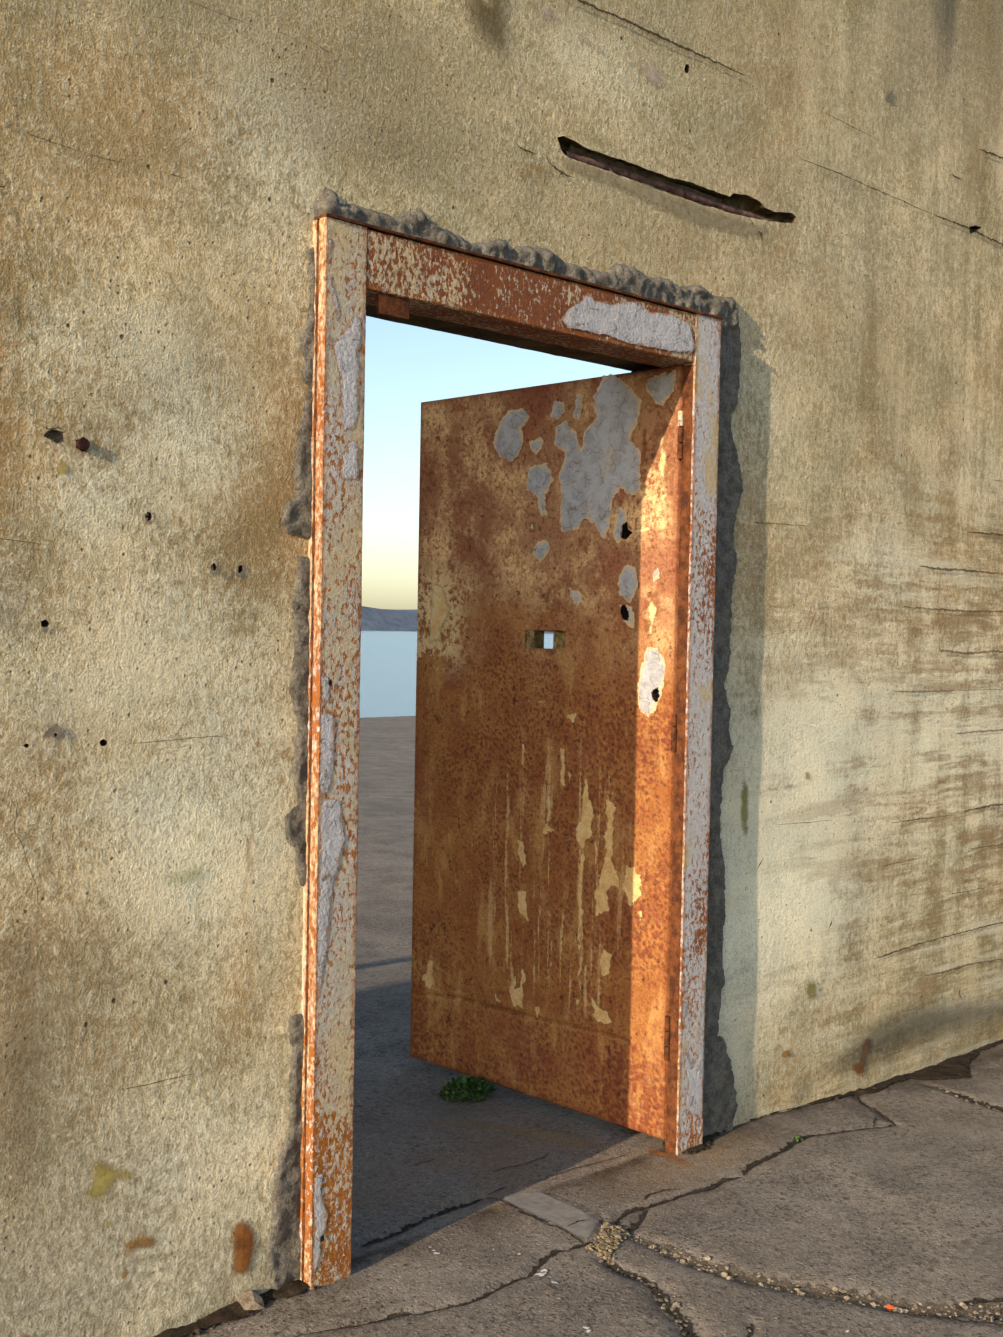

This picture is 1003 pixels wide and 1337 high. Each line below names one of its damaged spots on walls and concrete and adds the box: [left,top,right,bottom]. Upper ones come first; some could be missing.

crack [578,0,745,76]
crack [516,143,575,178]
spalling [557,136,796,234]
crack [802,159,1003,246]
crack [921,566,1003,574]
crack [904,605,1003,613]
crack [939,645,1003,655]
crack [895,687,1001,695]
crack [956,727,1003,735]
crack [892,804,1003,823]
crack [875,922,1003,999]
rust [233,1222,254,1274]